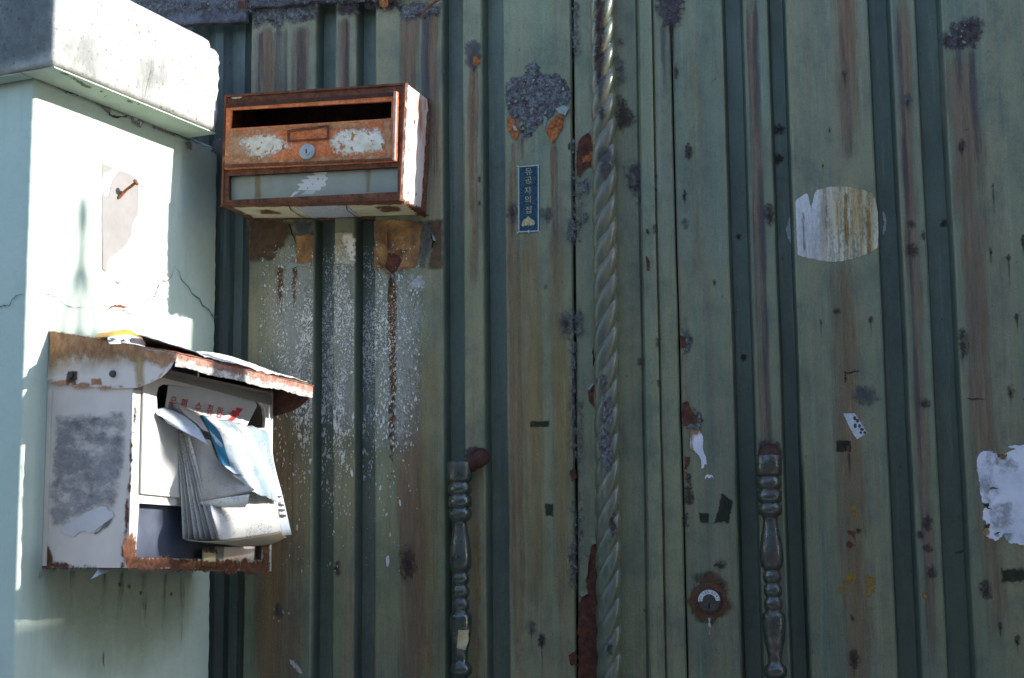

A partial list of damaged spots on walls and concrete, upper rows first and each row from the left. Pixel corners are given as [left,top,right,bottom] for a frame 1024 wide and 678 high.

corrosion [505,61,613,265]
crack [0,267,217,318]
corrosion [131,0,444,480]
corrosion [588,350,614,472]
peeling [681,401,713,527]
peeling [977,445,1024,545]
corrosion [568,536,612,678]